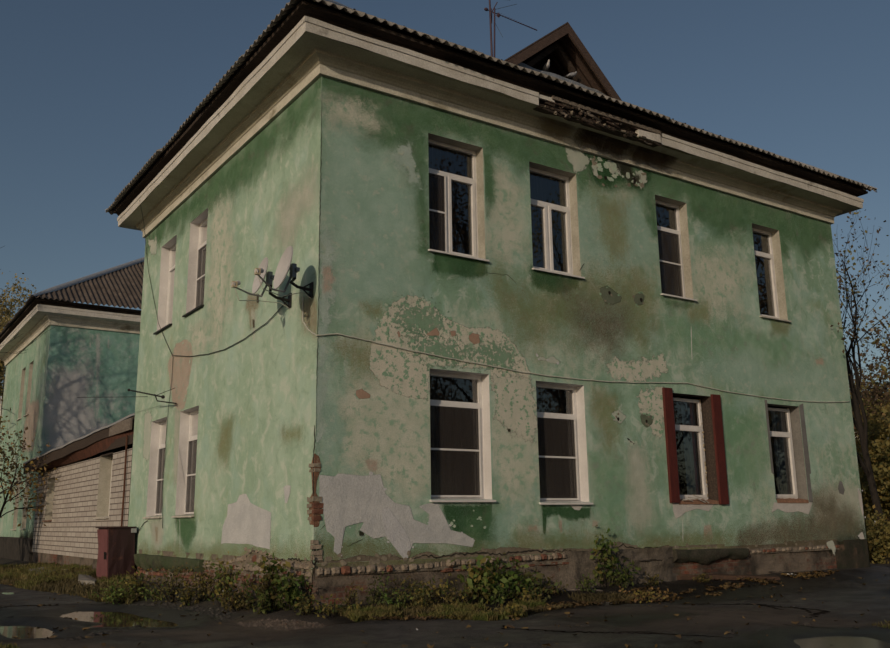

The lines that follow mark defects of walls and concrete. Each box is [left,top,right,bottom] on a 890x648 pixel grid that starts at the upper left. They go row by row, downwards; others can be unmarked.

spalling [565,147,652,192]
peeling [307,222,339,532]
peeling [369,290,537,443]
peeling [606,353,668,440]
spalling [234,537,591,573]
damp [137,482,866,572]